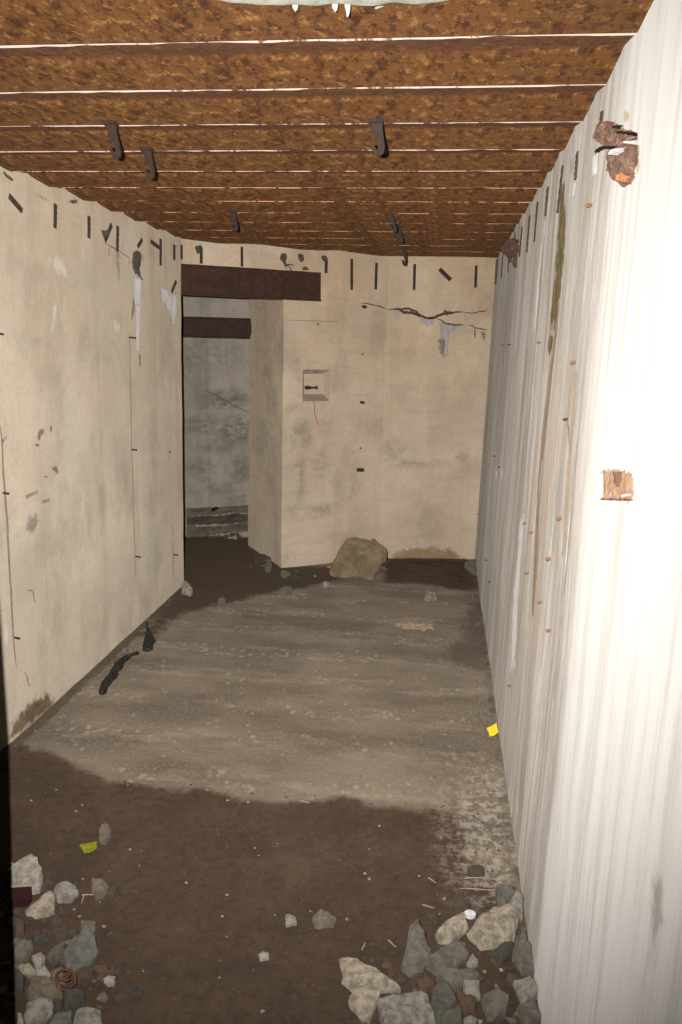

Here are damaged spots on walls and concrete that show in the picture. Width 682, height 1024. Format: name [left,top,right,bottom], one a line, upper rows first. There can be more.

spalling [593,121,639,187]
crack [362,303,488,337]
spalling [593,468,634,504]